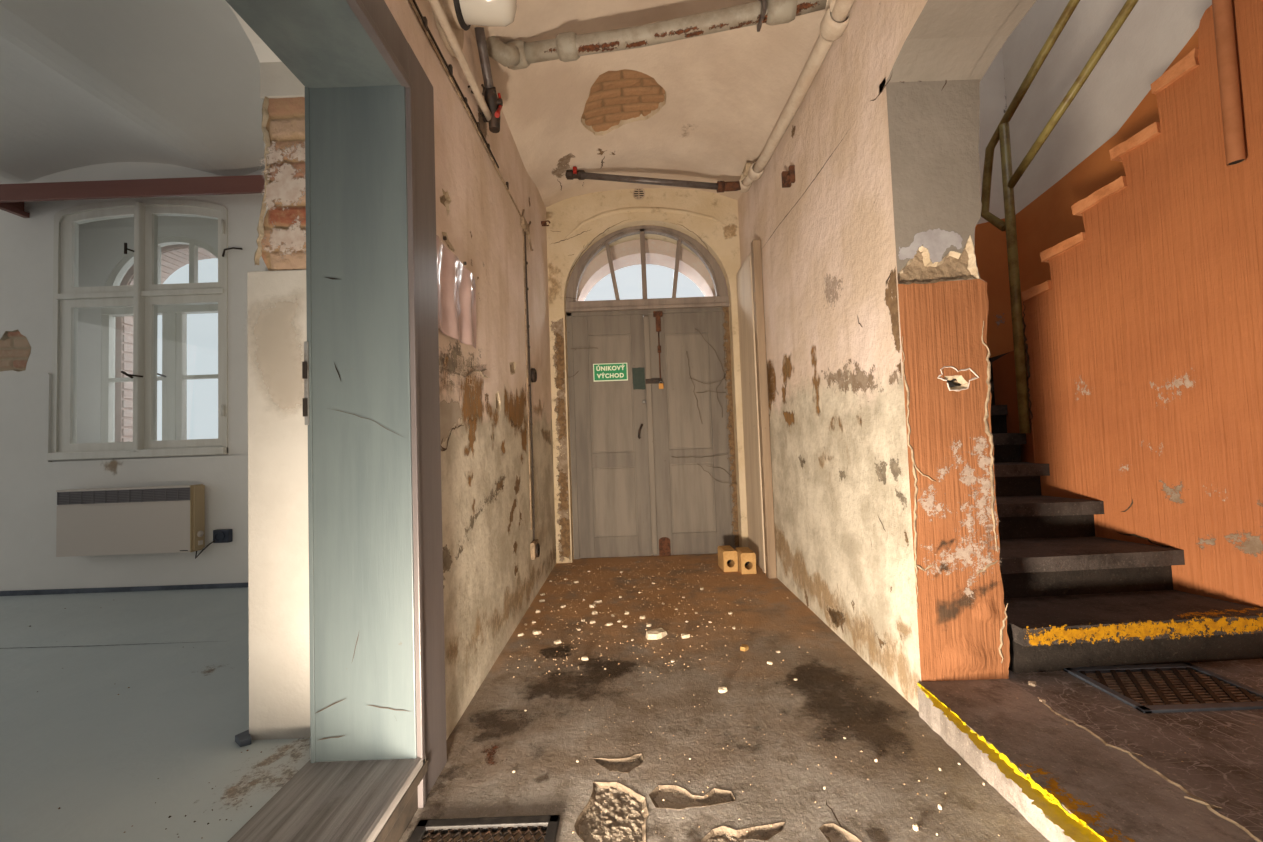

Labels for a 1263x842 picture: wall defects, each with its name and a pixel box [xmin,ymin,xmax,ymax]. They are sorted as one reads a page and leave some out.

spalling [581,69,666,155]
spalling [254,96,306,271]
spalling [0,329,31,371]
flaking render [485,391,518,429]
spalling [821,228,1000,609]
leakage [775,528,918,756]
spalling [998,603,1008,663]
leakage [470,644,636,741]
spalling [574,753,735,842]
spalling [700,822,785,842]
spalling [819,823,861,842]
leakage [866,828,888,842]